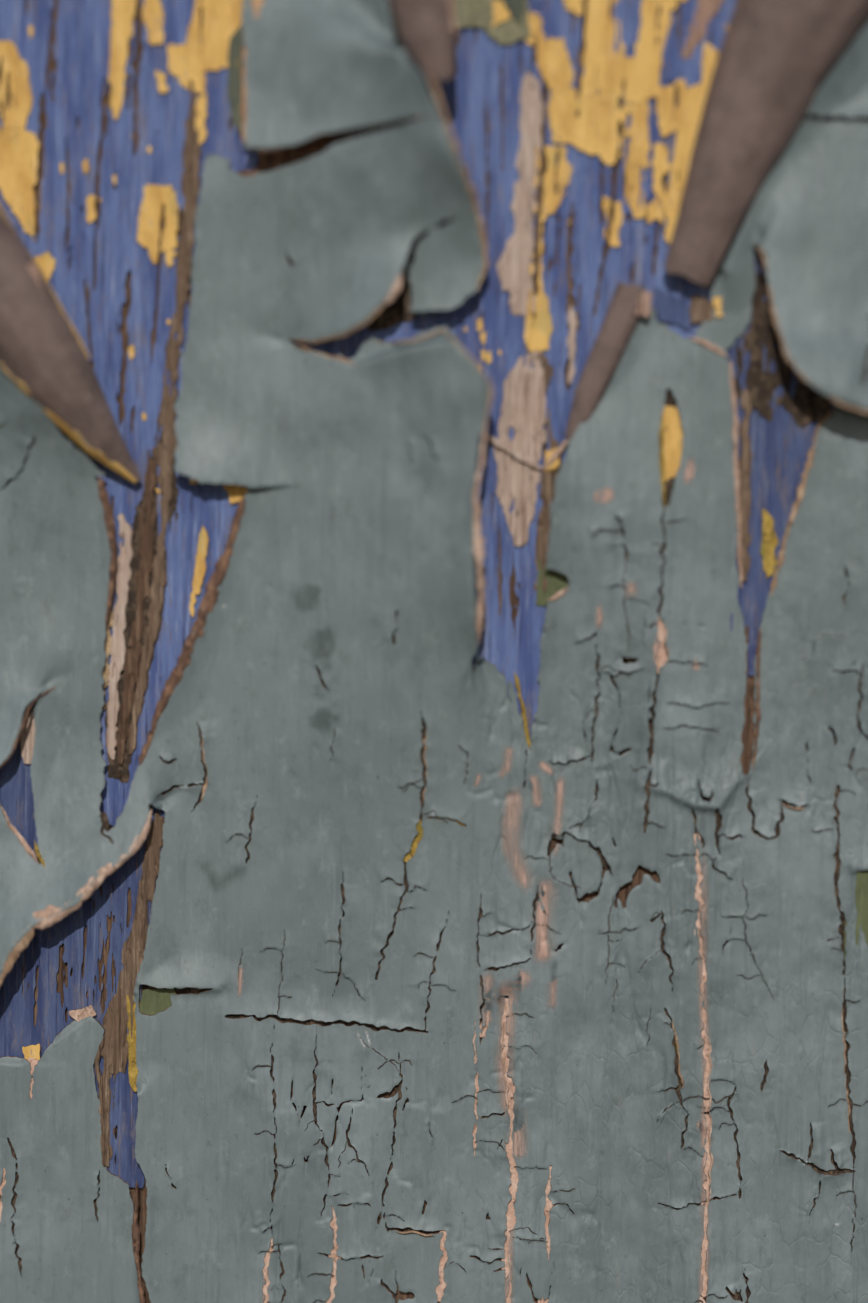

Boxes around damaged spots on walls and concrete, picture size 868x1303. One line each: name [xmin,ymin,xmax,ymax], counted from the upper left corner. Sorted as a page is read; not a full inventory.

peeling [0,0,868,826]
peeling [0,687,56,870]
peeling [506,763,563,959]
crack [226,501,868,1303]
peeling [844,870,868,958]
crack [28,1058,38,1099]
peeling [0,806,212,1303]
crack [0,1137,22,1271]
crack [93,1170,101,1221]